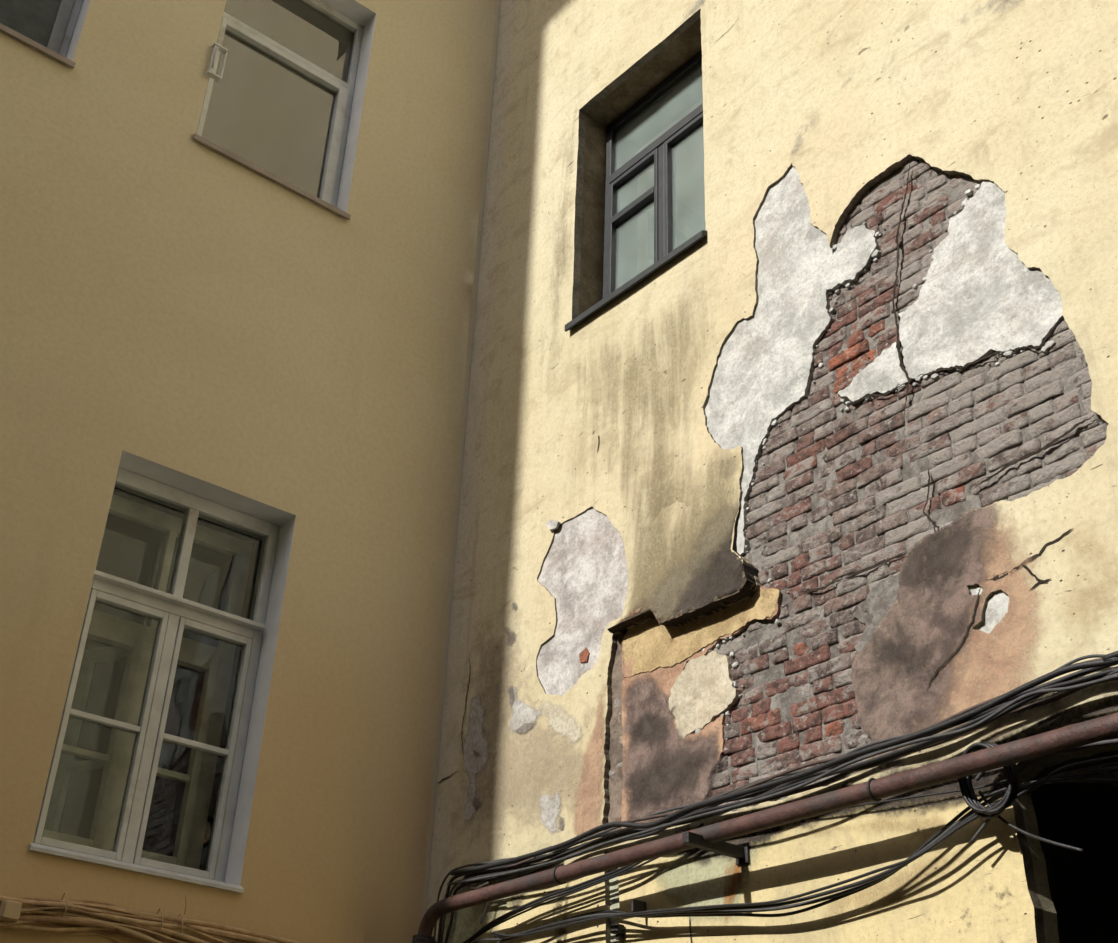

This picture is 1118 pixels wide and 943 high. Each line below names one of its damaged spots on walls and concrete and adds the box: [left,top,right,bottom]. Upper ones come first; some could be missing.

leakage [625,310,686,471]
spalling [508,508,628,742]
leakage [628,454,756,625]
spalling [608,158,1108,829]
leakage [902,523,1037,732]
crack [926,528,1074,690]
peeling [540,794,563,832]
leakage [632,712,668,744]
leakage [626,749,708,809]